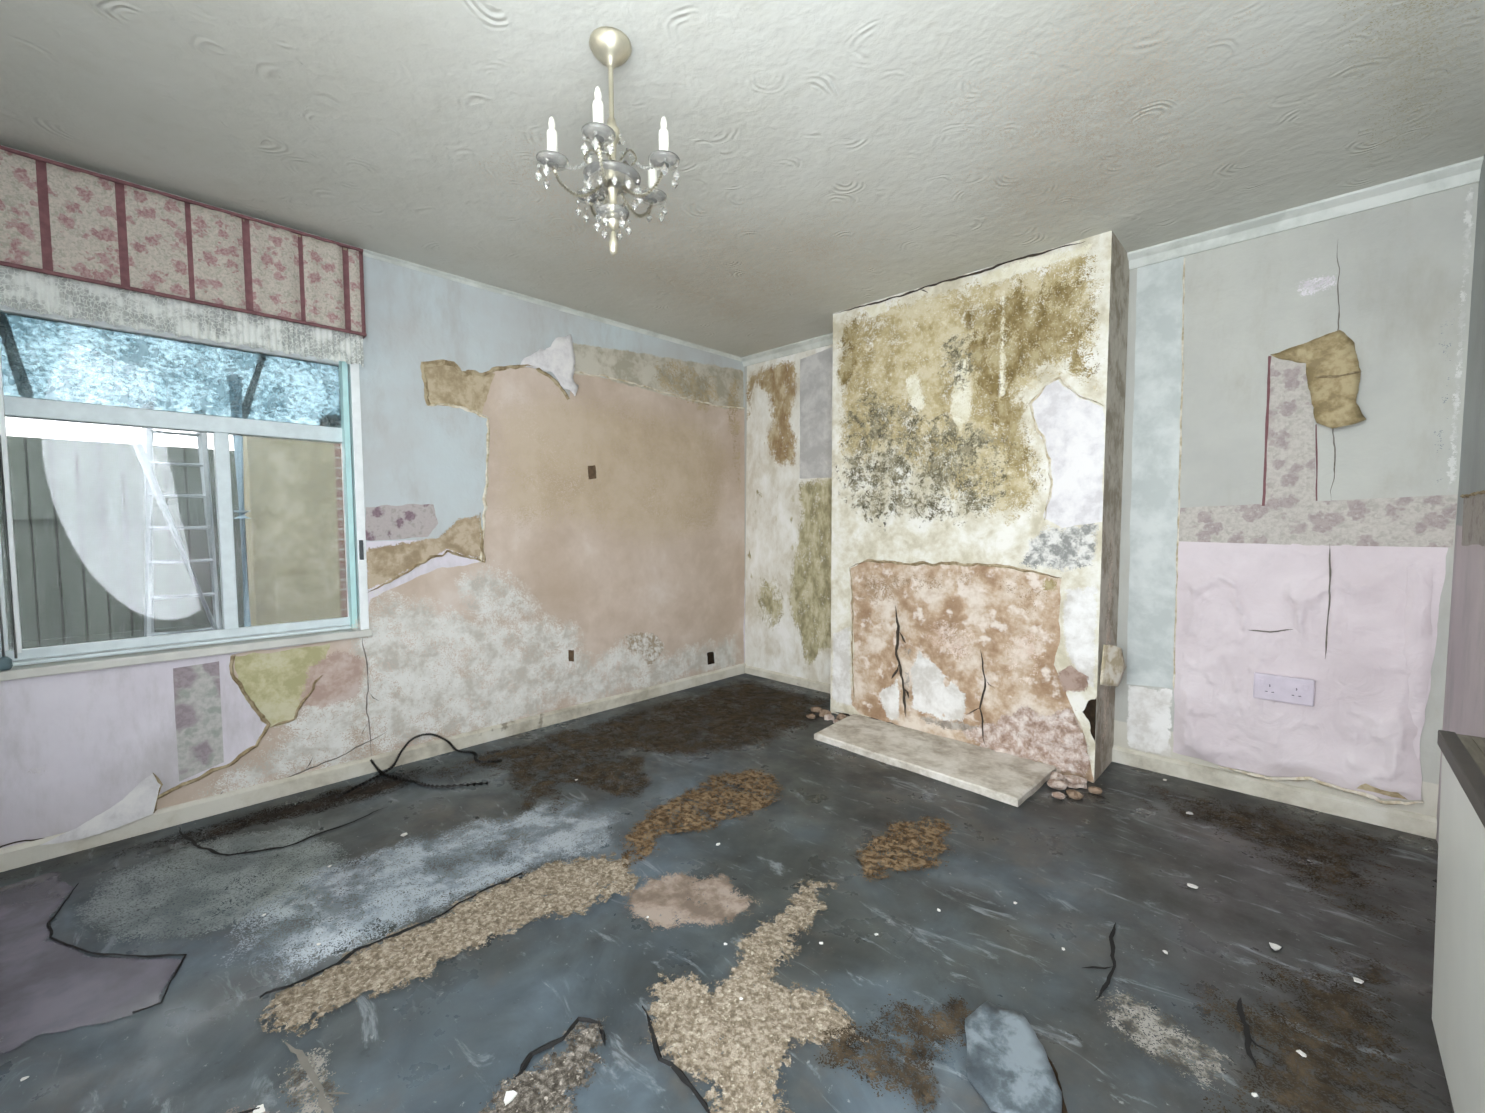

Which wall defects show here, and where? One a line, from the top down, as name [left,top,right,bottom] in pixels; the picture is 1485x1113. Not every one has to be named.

flaking render [156,334,745,809]
leakage [447,0,1301,670]
flaking render [831,559,1099,783]
crack [968,650,994,744]